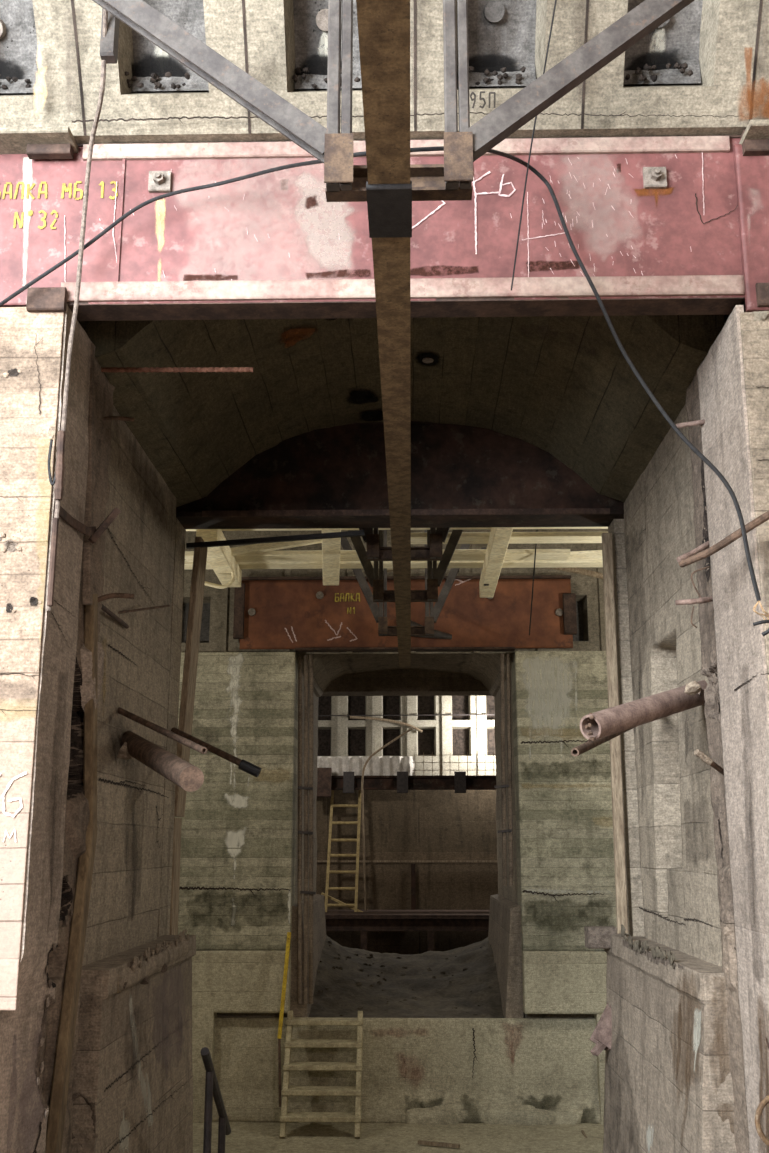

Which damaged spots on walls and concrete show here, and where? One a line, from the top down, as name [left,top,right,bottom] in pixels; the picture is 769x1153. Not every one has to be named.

rust [739,48,769,119]
spalling [67,657,85,799]
leakage [225,653,250,808]
leakage [225,829,245,879]
crack [471,1028,479,1078]